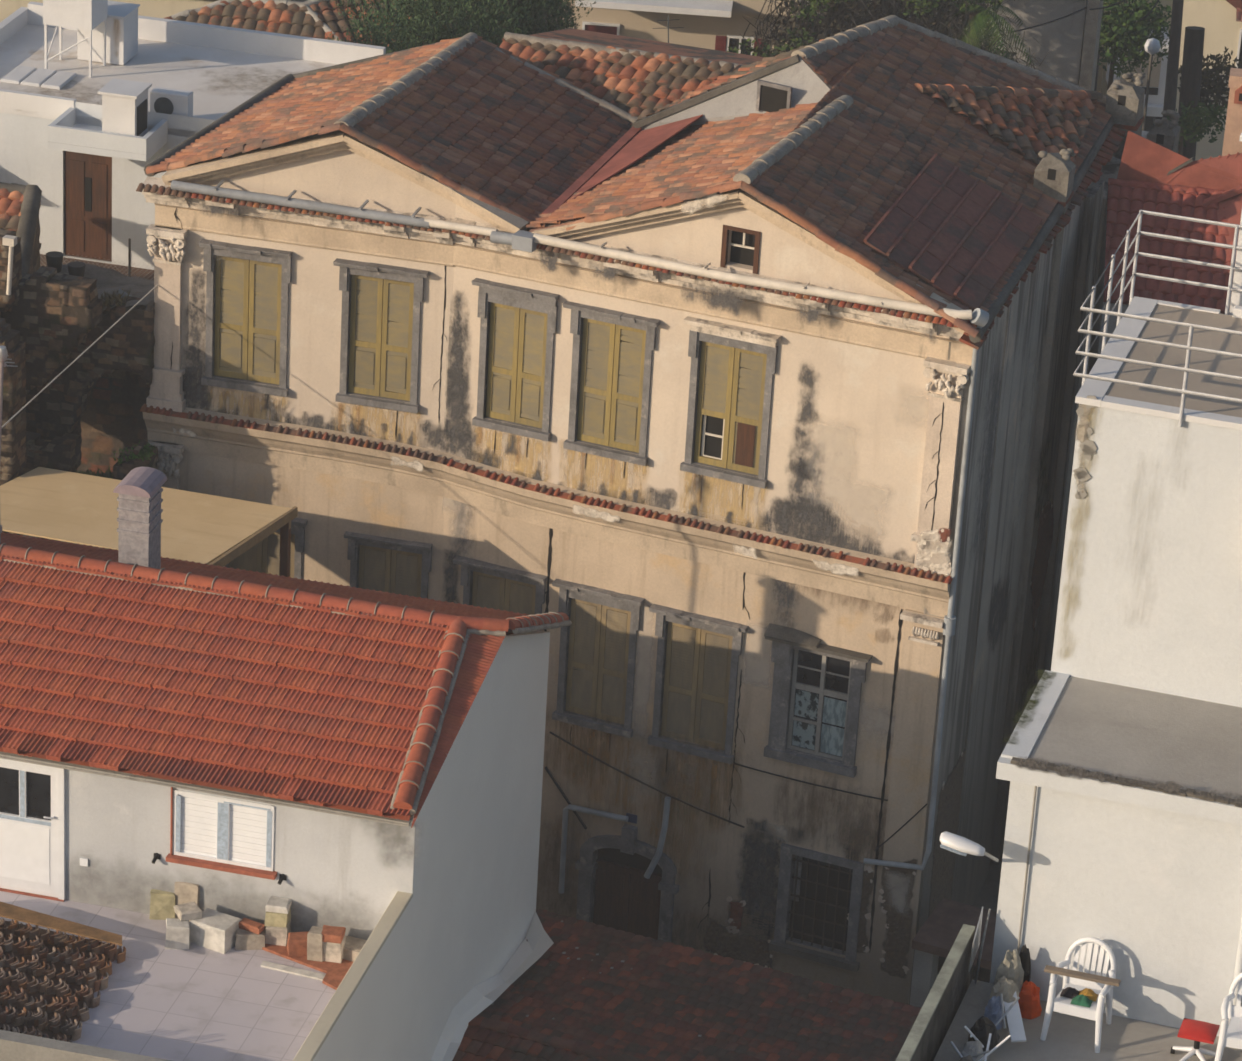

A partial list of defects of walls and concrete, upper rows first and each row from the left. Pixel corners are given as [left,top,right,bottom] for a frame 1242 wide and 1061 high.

damp [183,272,211,411]
damp [446,294,475,460]
damp [391,457,423,471]
damp [760,366,915,564]
crack [925,402,944,531]
crack [544,528,553,632]
damp [814,561,858,576]
damp [739,787,885,939]
flaking render [847,859,917,978]
flaking render [928,750,966,917]
mould [1016,758,1242,806]